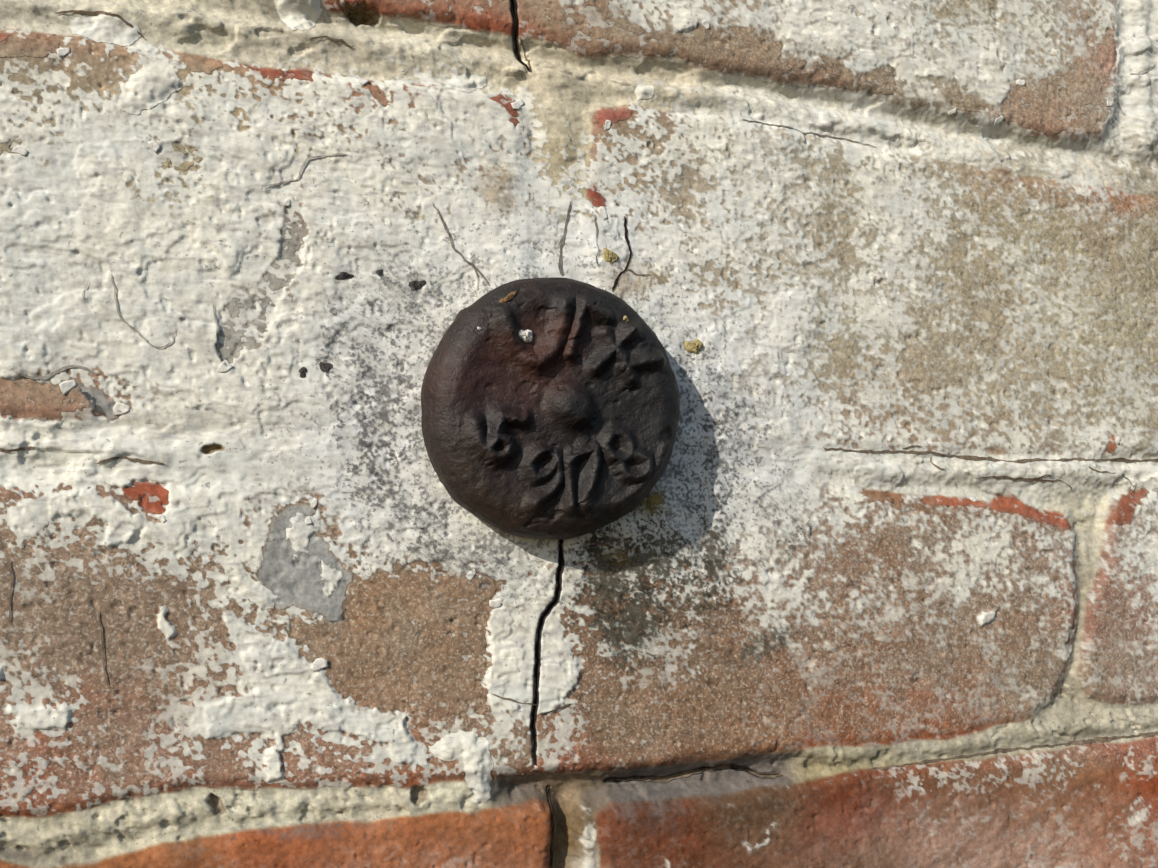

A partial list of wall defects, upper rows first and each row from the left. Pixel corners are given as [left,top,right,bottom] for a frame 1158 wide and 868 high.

peeling [67,14,141,46]
peeling [344,0,513,31]
crack [510,0,531,71]
peeling [527,0,896,94]
peeling [943,27,1117,136]
peeling [216,199,307,373]
peeling [0,379,131,420]
spalling [201,444,225,454]
peeling [123,481,169,523]
peeling [921,495,1070,530]
peeling [228,498,504,715]
crack [490,540,573,868]